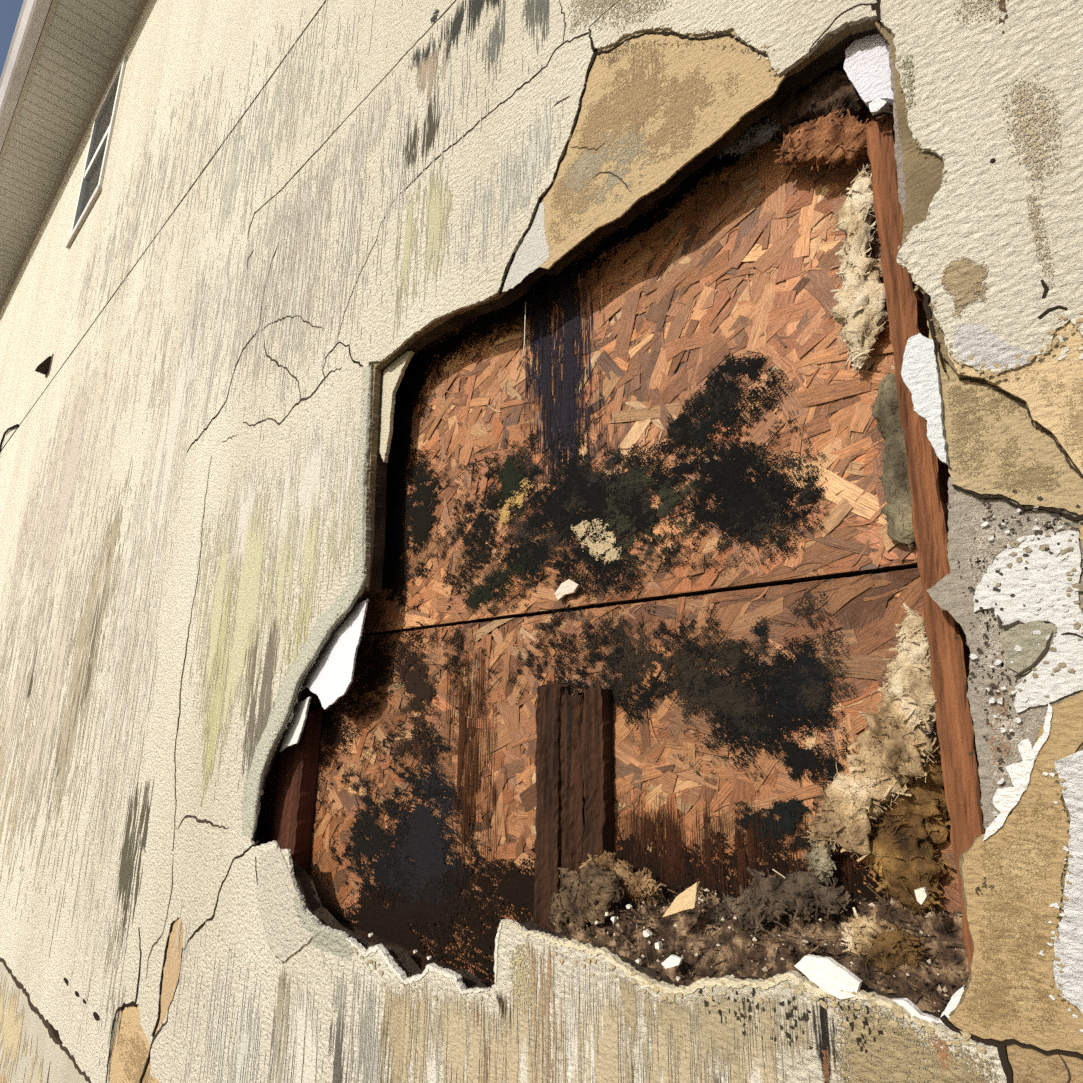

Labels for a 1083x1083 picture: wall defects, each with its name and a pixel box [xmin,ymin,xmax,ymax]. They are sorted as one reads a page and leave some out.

water stain [446,39,750,285]
spalling [502,24,785,292]
crack [809,0,881,52]
crack [873,110,893,118]
flaking render [843,34,947,215]
water stain [1001,73,1065,289]
water stain [0,0,502,1083]
crack [0,0,774,1083]
spalling [554,579,580,600]
water stain [310,152,887,983]
flaking render [257,849,314,962]
water stain [831,998,1000,1083]